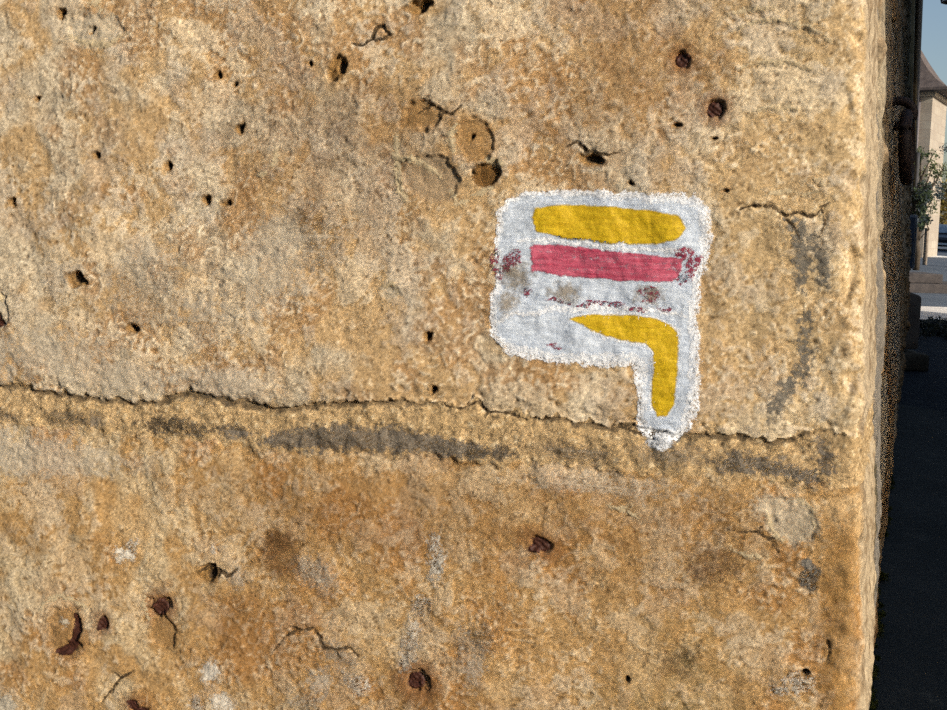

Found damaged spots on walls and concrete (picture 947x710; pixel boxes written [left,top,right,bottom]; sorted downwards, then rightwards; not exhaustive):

crack [352,24,390,46]
crack [418,104,462,122]
crack [567,140,619,158]
crack [740,202,830,239]
leakage [783,216,833,296]
leakage [762,308,822,424]
crack [2,384,810,445]
leakage [136,416,521,463]
corrosion [56,613,83,655]
corrosion [96,613,109,631]
crack [274,626,359,658]
corrosion [398,663,435,698]